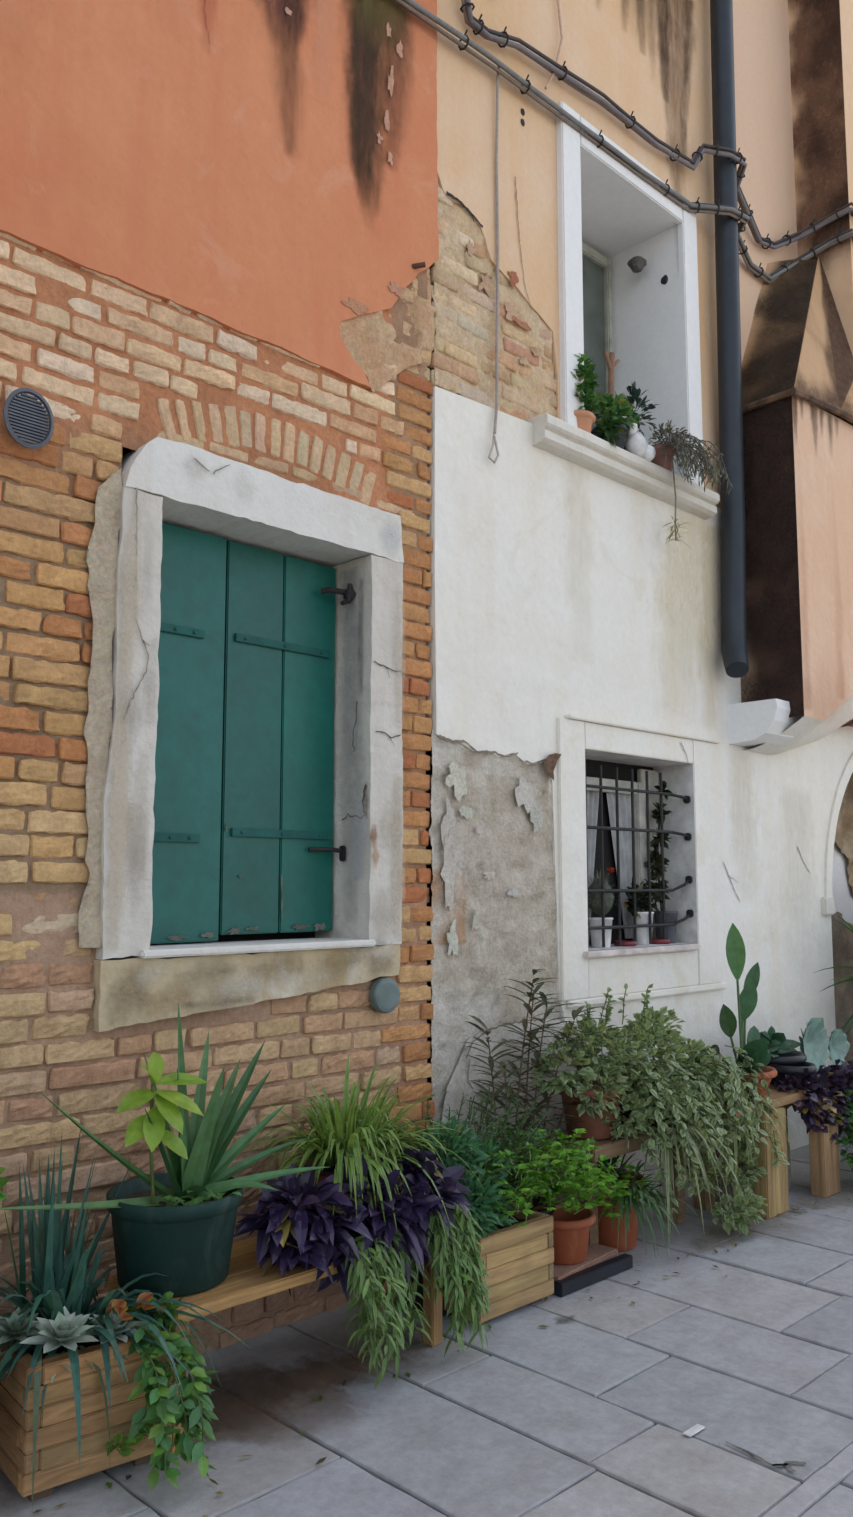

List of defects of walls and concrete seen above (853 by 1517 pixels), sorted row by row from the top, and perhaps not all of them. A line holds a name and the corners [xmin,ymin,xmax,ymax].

water stain [268,0,303,32]
water stain [351,0,406,190]
water stain [641,0,687,86]
flaking render [338,184,558,422]
crack [124,487,151,720]
flaking render [429,730,563,1131]